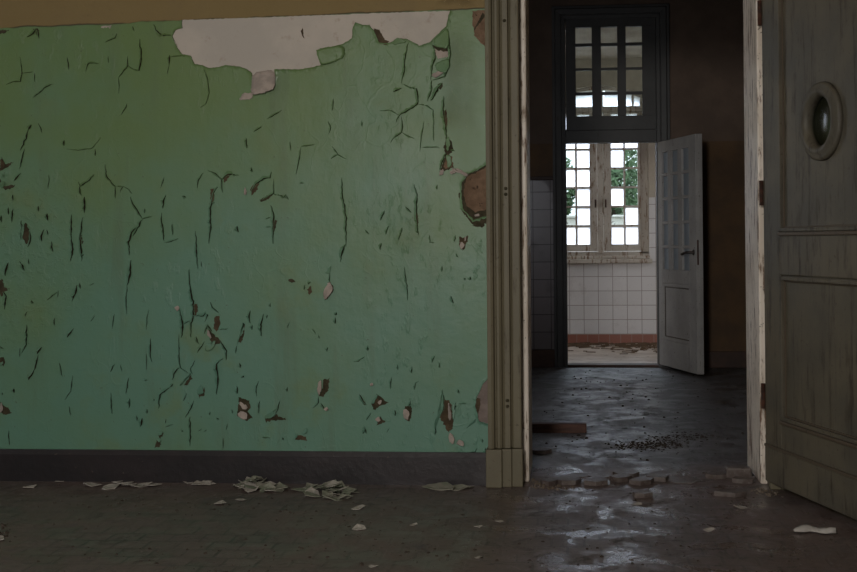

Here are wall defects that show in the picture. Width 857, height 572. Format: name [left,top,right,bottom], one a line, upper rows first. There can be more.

peeling [0,159,32,247]
crack [14,124,42,181]
crack [66,24,186,115]
peeling [170,10,486,257]
crack [289,99,434,262]
crack [380,43,440,148]
crack [19,139,228,447]
peeling [175,269,228,401]
crack [213,340,244,395]
peeling [231,381,286,423]
peeling [359,383,412,434]
flaking render [433,376,488,446]